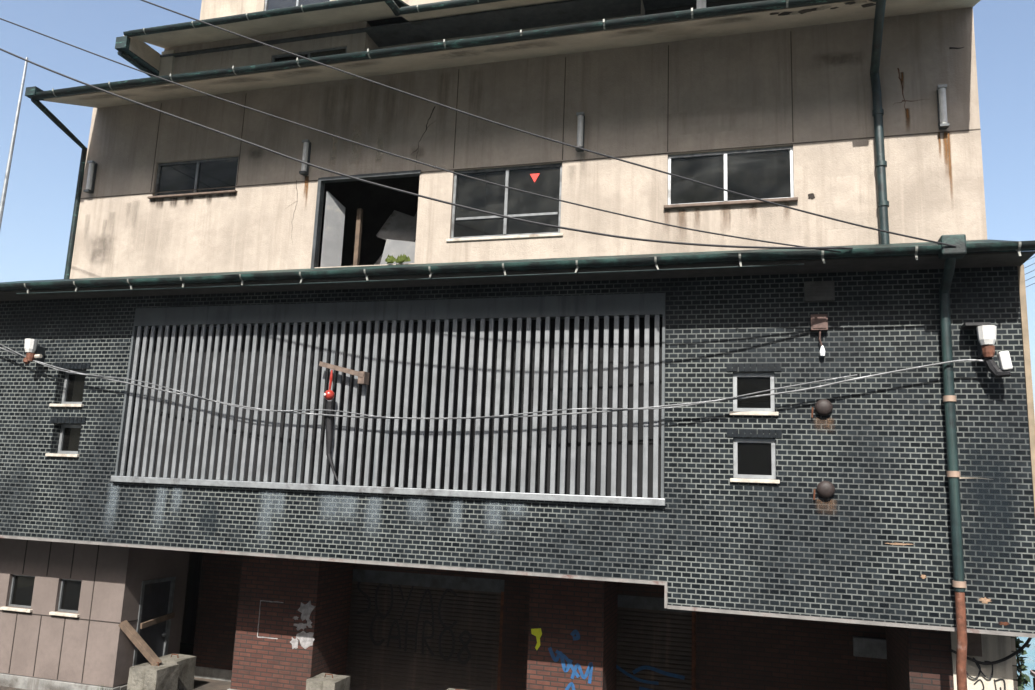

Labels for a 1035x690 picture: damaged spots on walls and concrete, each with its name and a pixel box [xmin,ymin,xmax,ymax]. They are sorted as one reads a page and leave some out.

corrosion [938,132,952,182]
peeling [290,601,316,649]